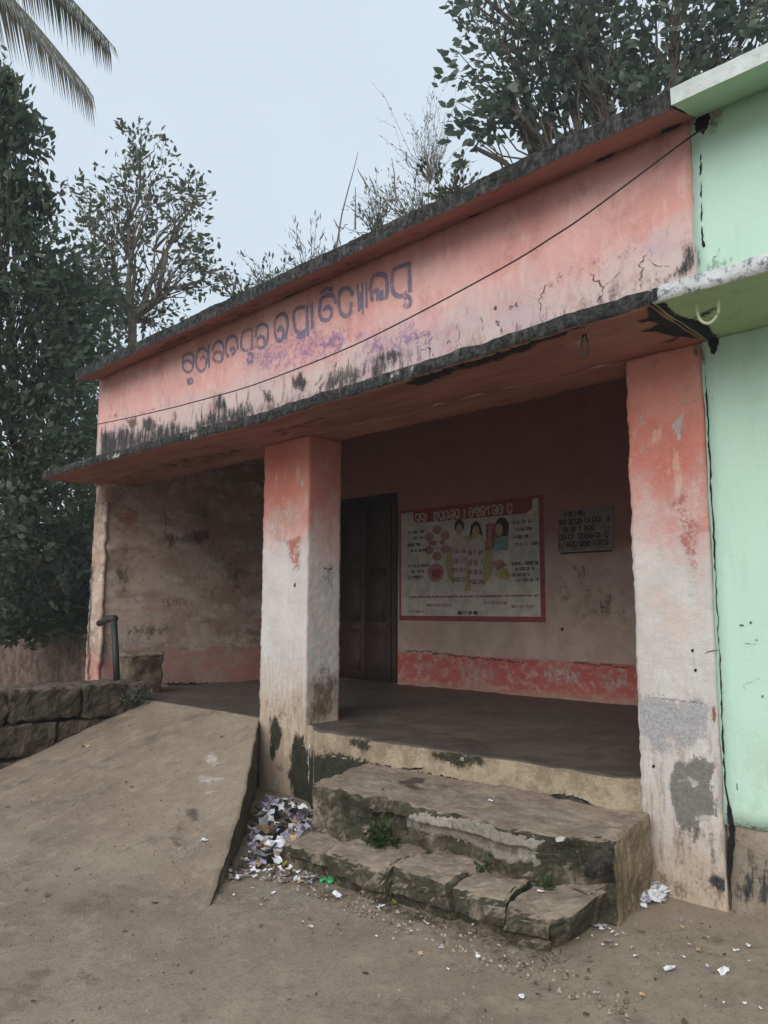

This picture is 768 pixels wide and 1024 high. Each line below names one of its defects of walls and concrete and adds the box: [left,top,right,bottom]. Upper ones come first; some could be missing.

crack [699,153,719,261]
crack [590,249,670,301]
damp [320,349,403,390]
damp [100,373,306,454]
damp [269,716,370,809]
spalling [402,811,541,867]
damp [736,873,768,903]